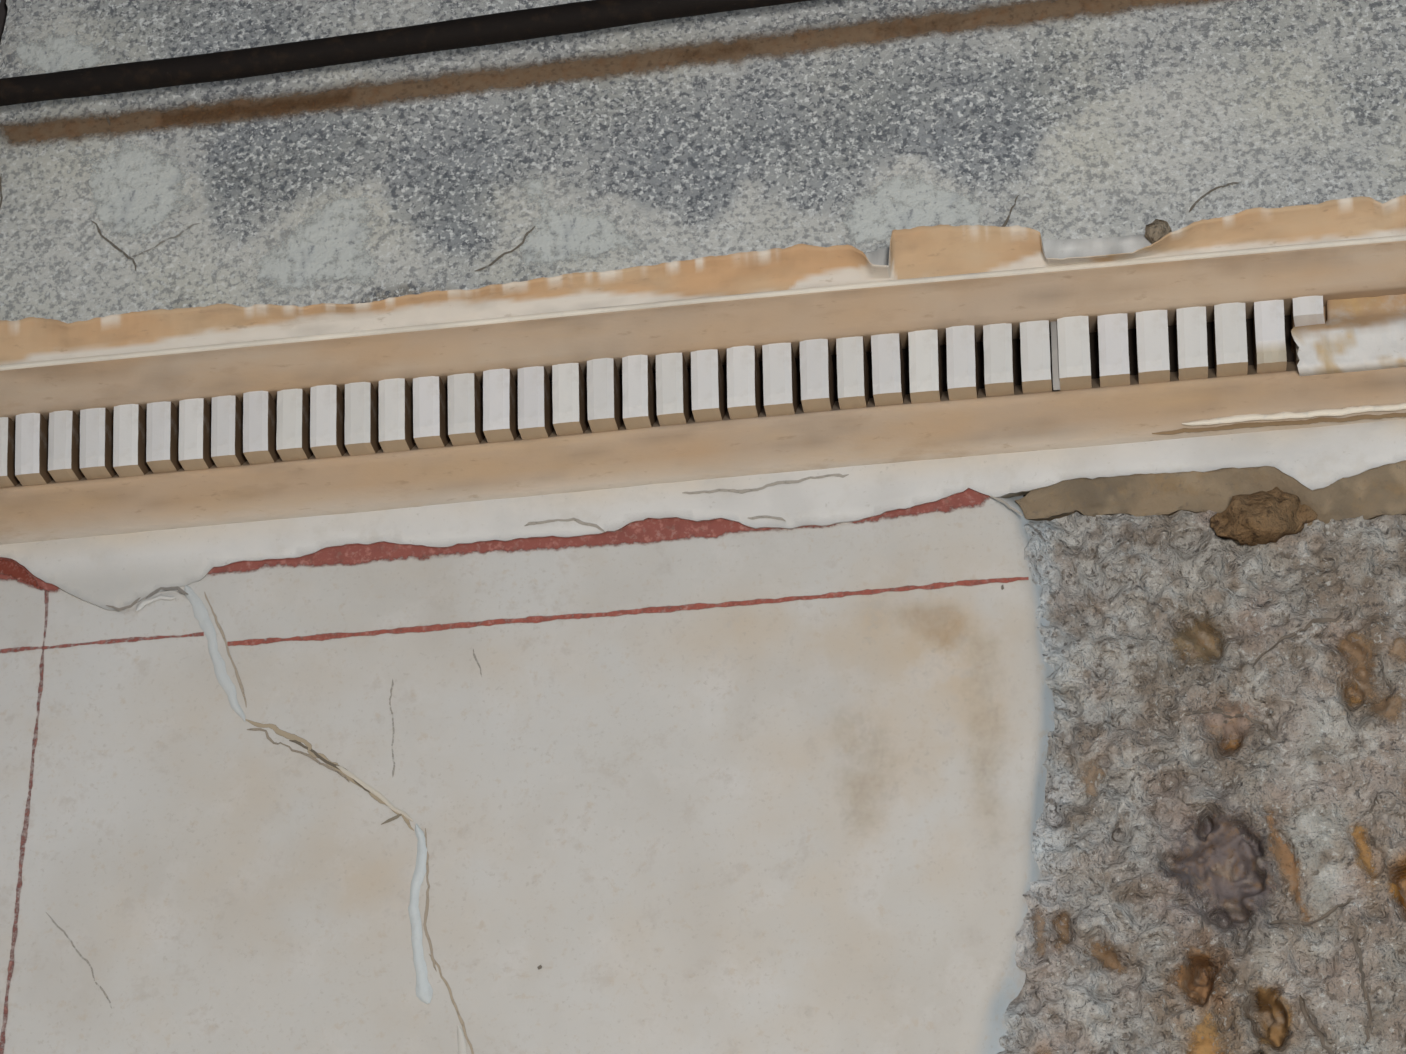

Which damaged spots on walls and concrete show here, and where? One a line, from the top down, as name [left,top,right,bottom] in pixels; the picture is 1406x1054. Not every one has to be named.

crack [91,220,199,271]
spalling [1291,294,1406,376]
spalling [997,461,1406,1054]
crack [184,585,474,1054]
crack [47,913,110,1002]